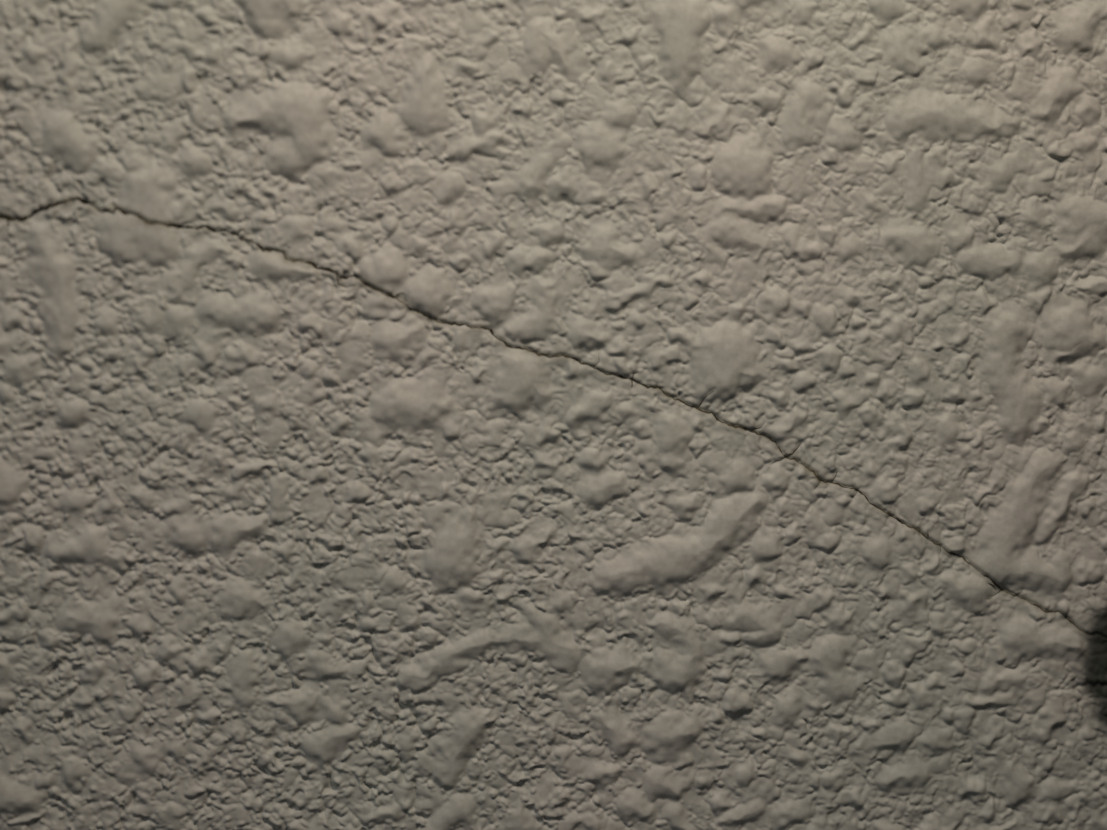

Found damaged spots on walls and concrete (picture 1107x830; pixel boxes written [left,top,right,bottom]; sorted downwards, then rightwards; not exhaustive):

crack [0,197,1091,635]